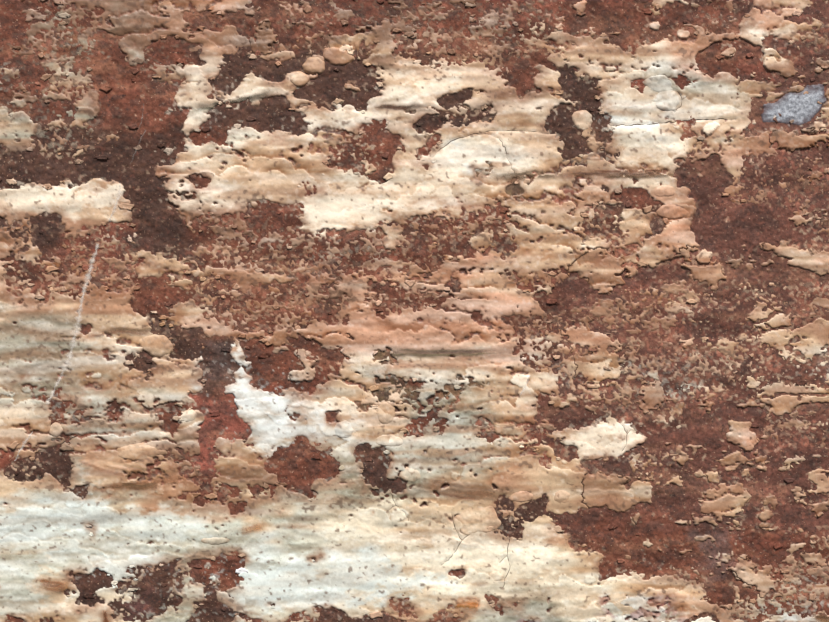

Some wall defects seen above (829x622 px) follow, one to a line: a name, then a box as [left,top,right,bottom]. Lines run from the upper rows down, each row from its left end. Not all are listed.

corrosion [373,199,520,287]
corrosion [574,200,641,258]
corrosion [501,269,559,355]
corrosion [89,264,254,515]
corrosion [325,410,341,425]
corrosion [520,342,567,374]
corrosion [247,436,345,502]
corrosion [42,551,268,622]
corrosion [286,593,418,622]
corrosion [448,569,465,579]
corrosion [429,594,504,622]
corrosion [568,529,829,622]